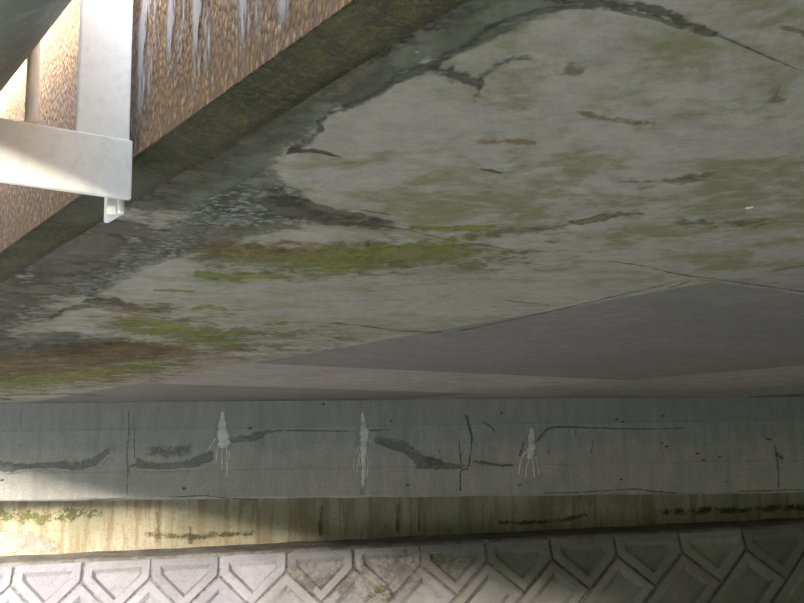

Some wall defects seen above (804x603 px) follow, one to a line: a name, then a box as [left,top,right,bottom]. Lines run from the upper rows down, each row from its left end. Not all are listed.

water stain [0,0,718,400]
water stain [0,449,112,473]
crack [126,411,135,494]
water stain [136,412,341,478]
water stain [353,412,388,489]
water stain [381,442,463,470]
crack [459,416,494,491]
water stain [474,426,655,479]
water stain [0,530,56,555]
water stain [662,504,804,515]